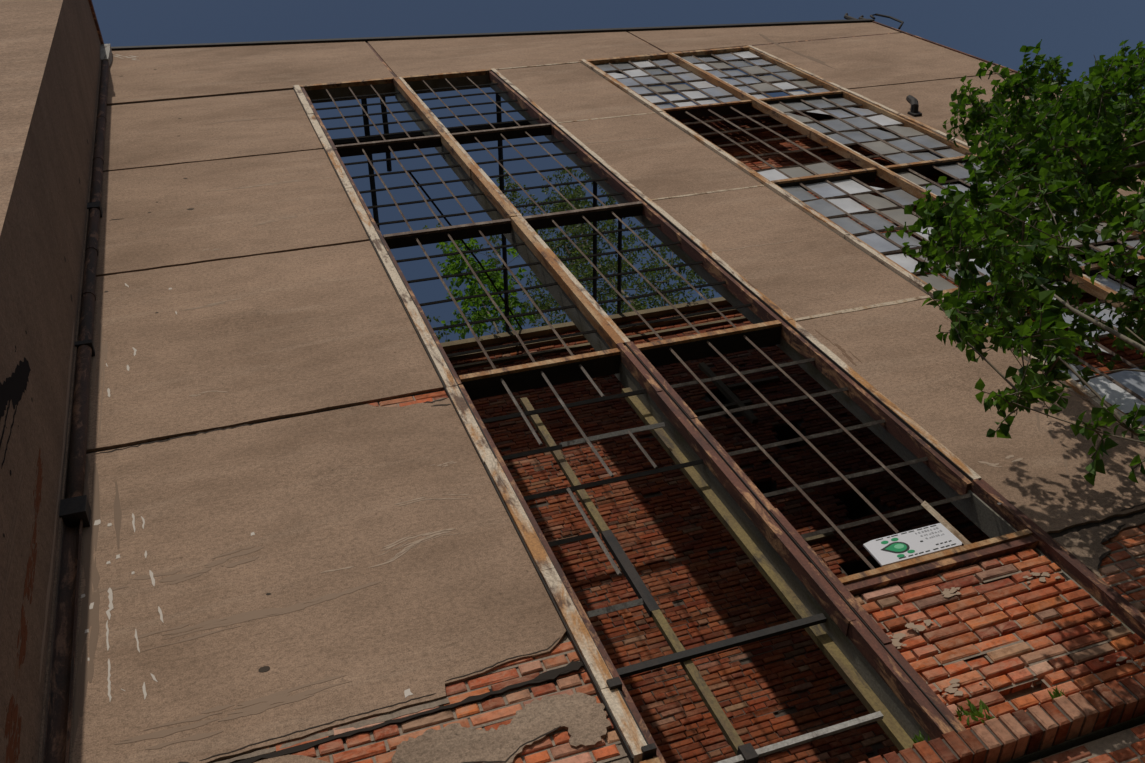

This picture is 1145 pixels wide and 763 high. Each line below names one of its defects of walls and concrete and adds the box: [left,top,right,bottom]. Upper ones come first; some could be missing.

crack [1098,503,1145,569]
flaking render [1098,525,1145,615]
crack [199,637,583,763]
flaking render [262,635,630,763]